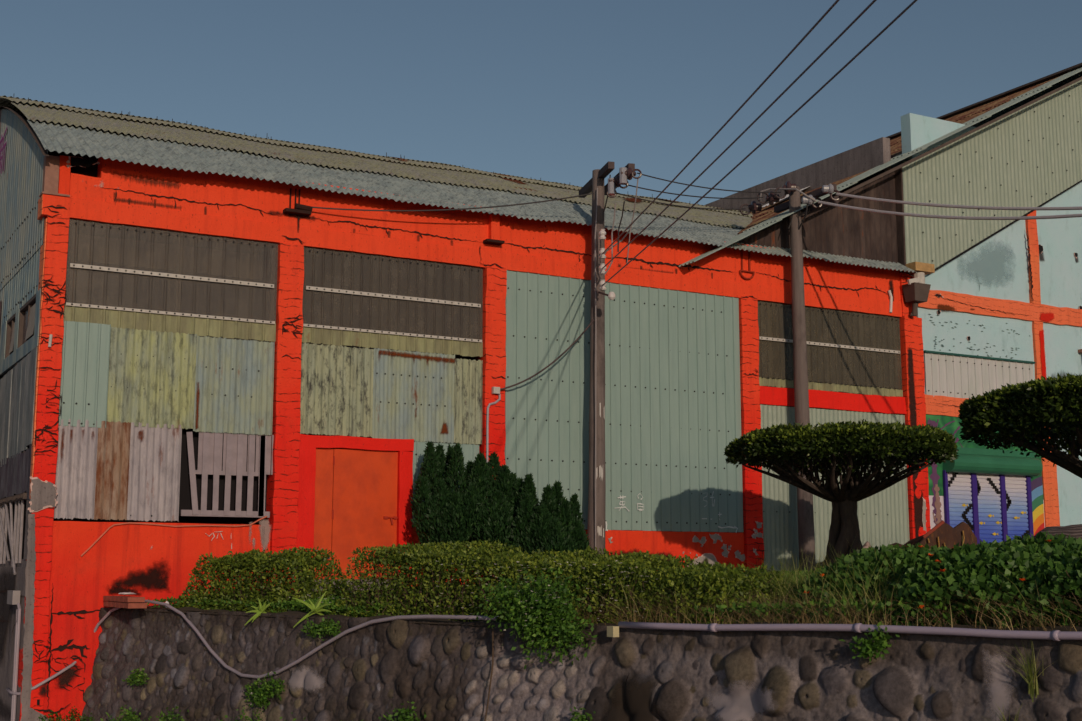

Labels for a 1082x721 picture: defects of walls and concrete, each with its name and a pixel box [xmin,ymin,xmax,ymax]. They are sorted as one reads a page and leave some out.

crack [43,205,68,224]
crack [102,187,304,245]
crack [317,218,887,299]
spalling [28,476,58,512]
peeling [683,521,763,566]
water stain [112,563,169,589]
crack [0,589,101,716]